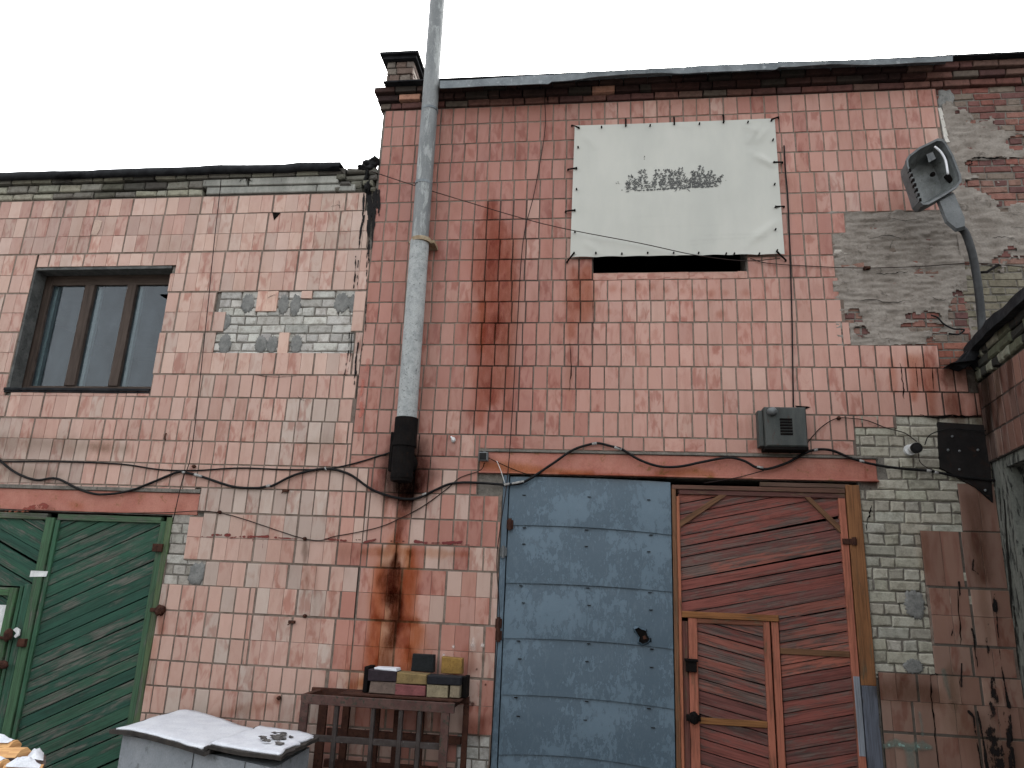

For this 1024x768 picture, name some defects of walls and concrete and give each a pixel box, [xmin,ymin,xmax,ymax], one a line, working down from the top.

spalling [214,291,355,353]
leakage [344,189,381,385]
peeling [827,86,1024,370]
spalling [163,515,206,585]
rust [385,554,401,645]
spalling [855,416,983,679]